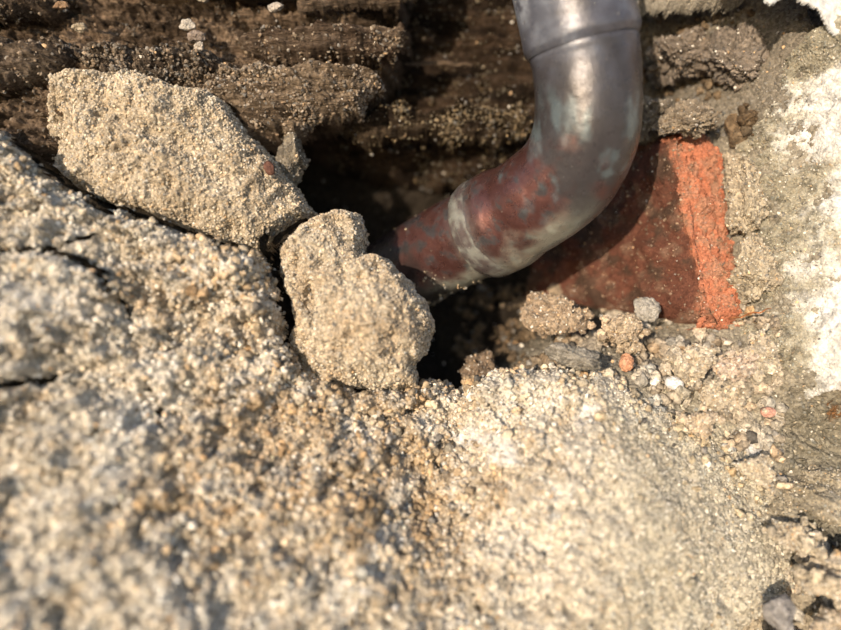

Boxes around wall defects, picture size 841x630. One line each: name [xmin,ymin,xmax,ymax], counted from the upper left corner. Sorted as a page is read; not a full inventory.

crack [14,140,308,301]
crack [0,233,132,320]
crack [0,371,75,390]